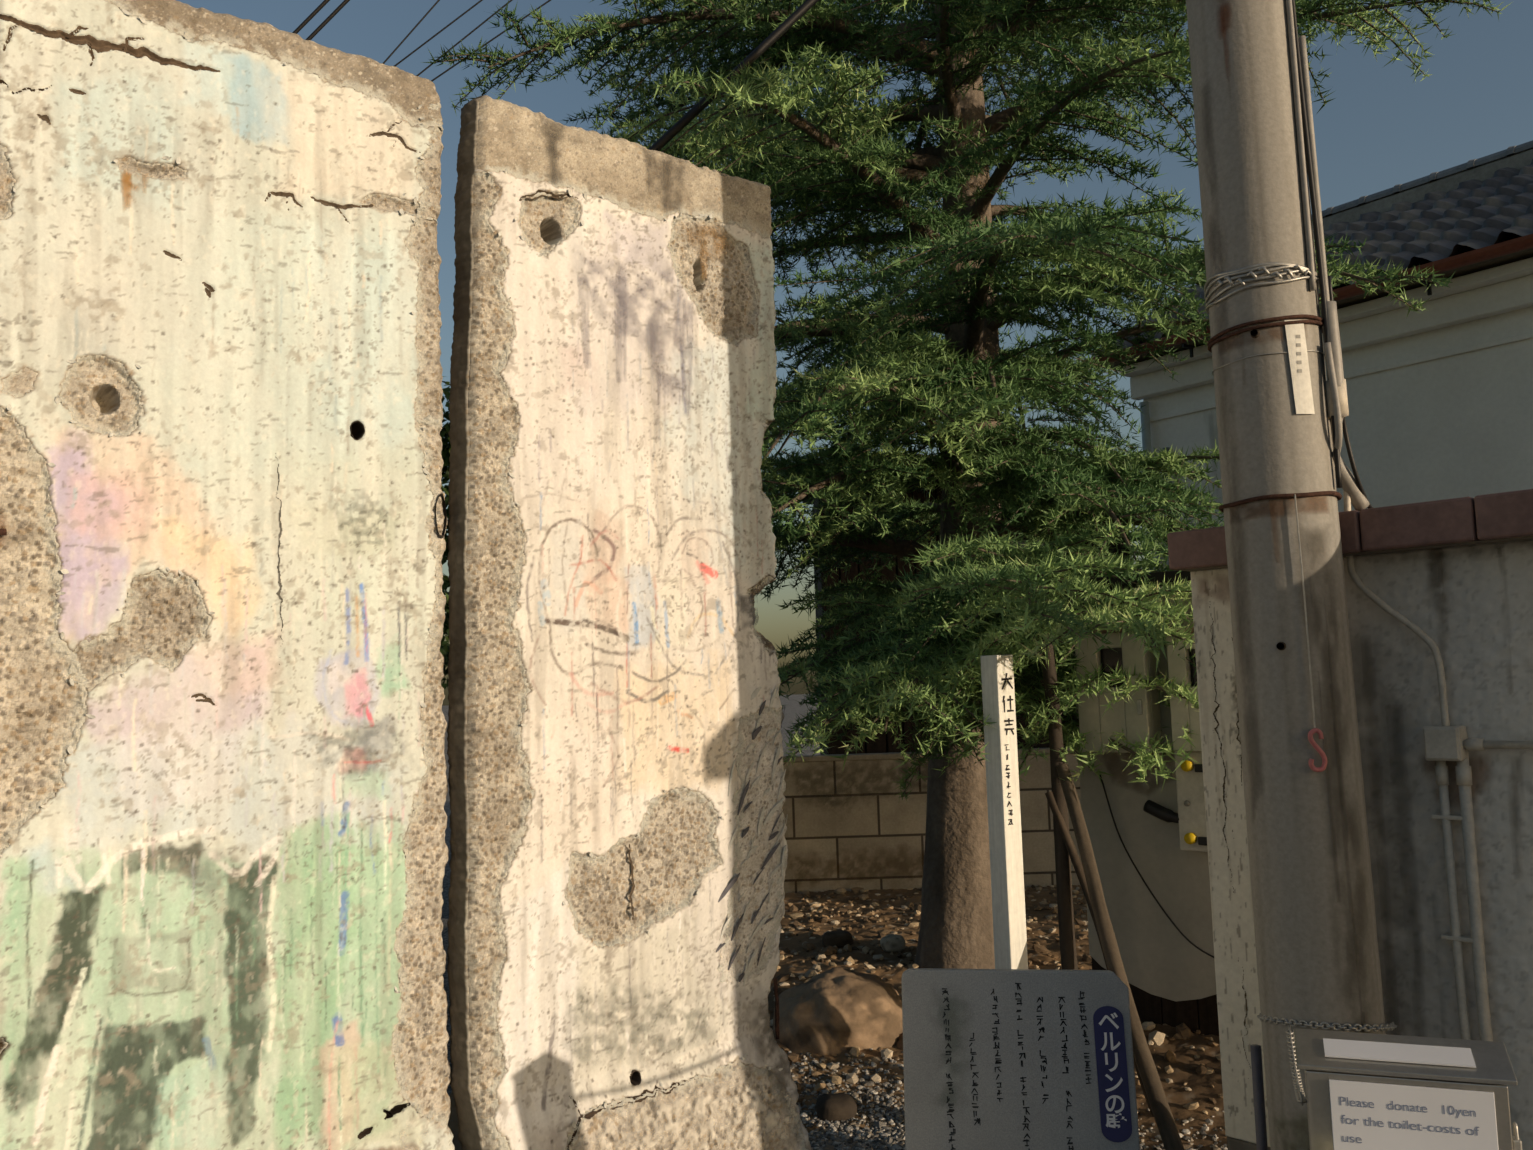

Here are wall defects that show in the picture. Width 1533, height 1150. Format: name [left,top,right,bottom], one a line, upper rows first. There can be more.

crack [0,14,221,94]
crack [369,121,421,153]
crack [265,191,374,224]
spalling [55,355,144,437]
spalling [105,0,451,1132]
spalling [0,368,215,858]
spalling [466,96,808,1150]
crack [1209,606,1242,893]
crack [329,1102,411,1150]